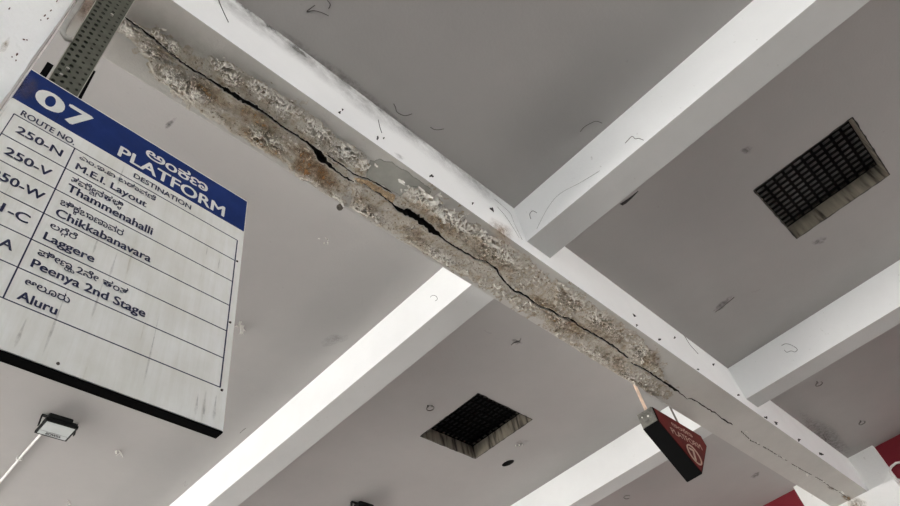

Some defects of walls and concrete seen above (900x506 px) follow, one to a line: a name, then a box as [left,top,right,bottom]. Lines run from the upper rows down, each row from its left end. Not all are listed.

corrosion [296,150,336,186]
peeling [117,19,680,400]
crack [125,17,851,500]